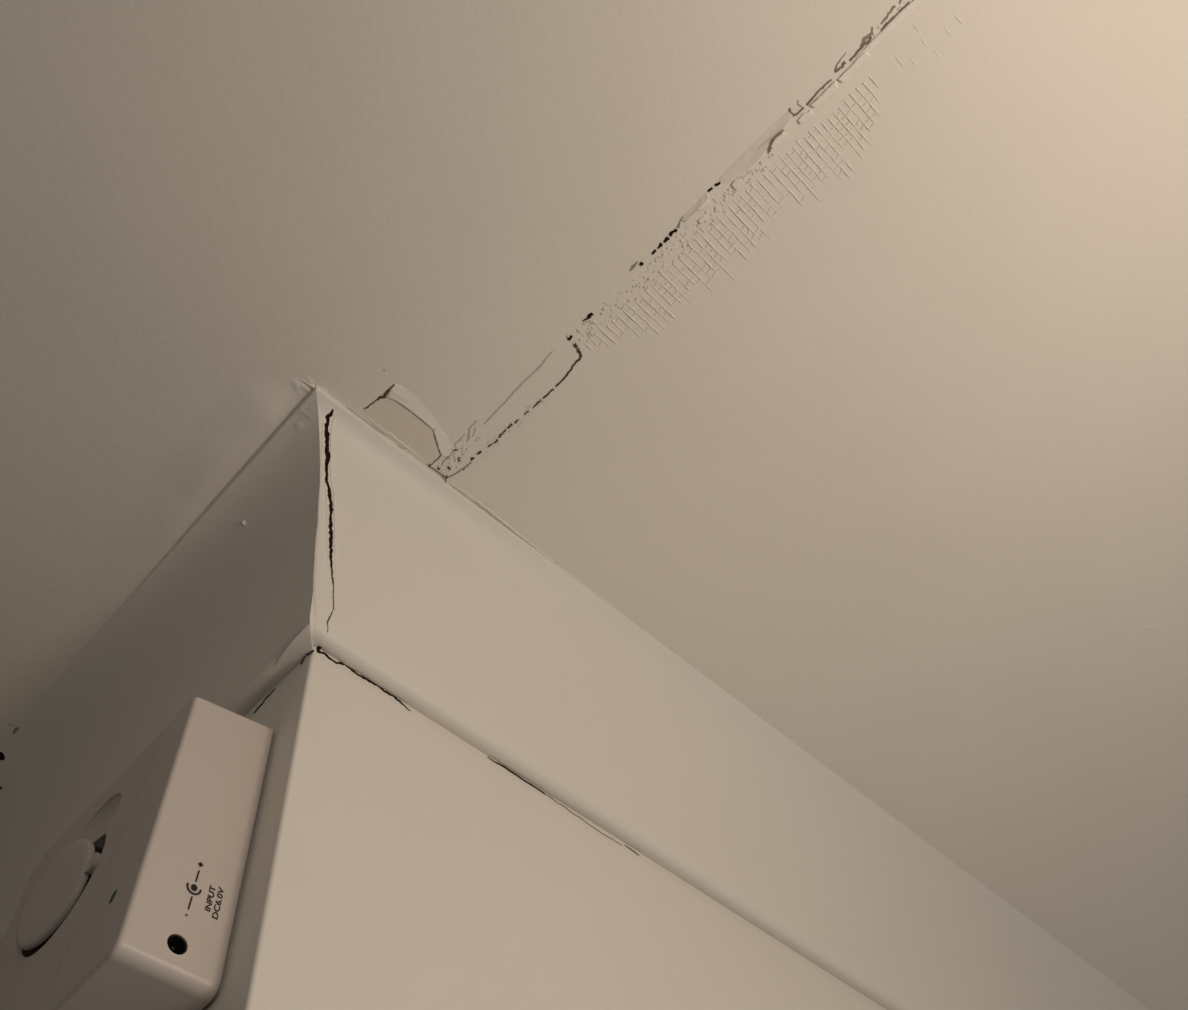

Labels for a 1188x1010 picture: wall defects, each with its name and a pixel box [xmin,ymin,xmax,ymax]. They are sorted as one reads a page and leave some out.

crack [300,407,410,711]
peeling [361,384,455,466]
crack [428,0,965,619]
crack [488,757,639,856]